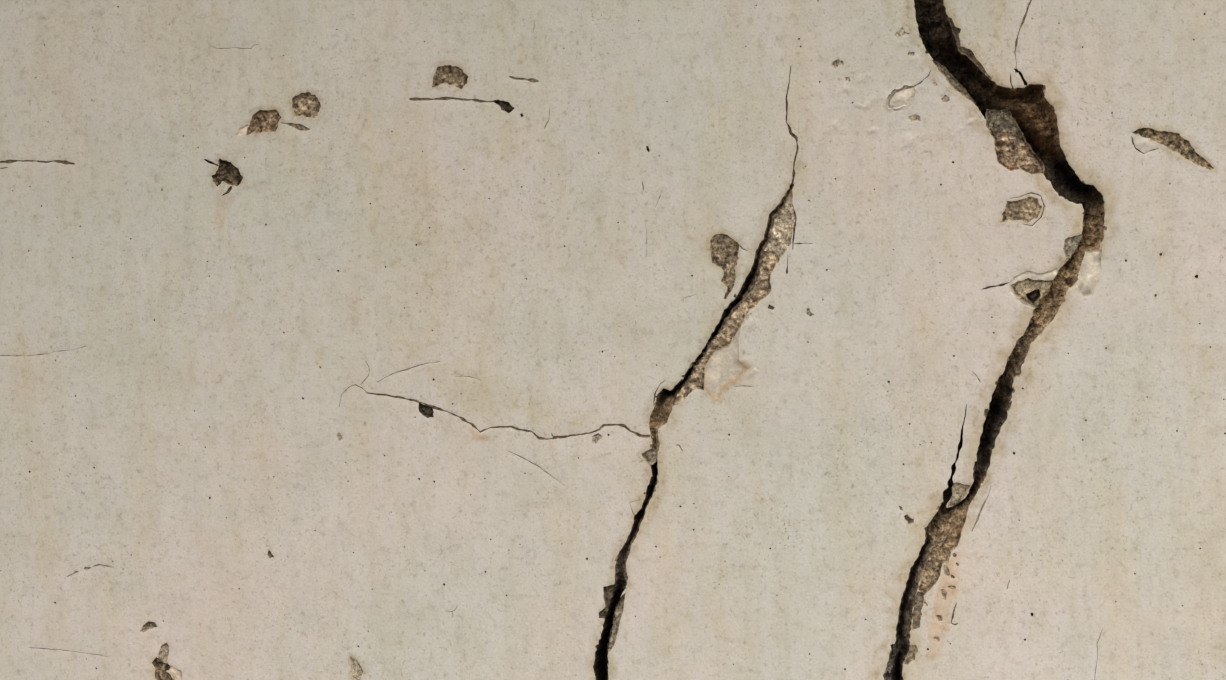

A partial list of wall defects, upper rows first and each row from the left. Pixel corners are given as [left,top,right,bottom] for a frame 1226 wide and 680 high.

spalling [424,56,477,94]
spalling [236,82,327,142]
spalling [204,151,253,196]
spalling [1124,121,1222,174]
spalling [991,189,1051,230]
spalling [701,224,748,307]
crack [864,0,1127,680]
crack [339,65,813,680]
spalling [144,643,183,680]